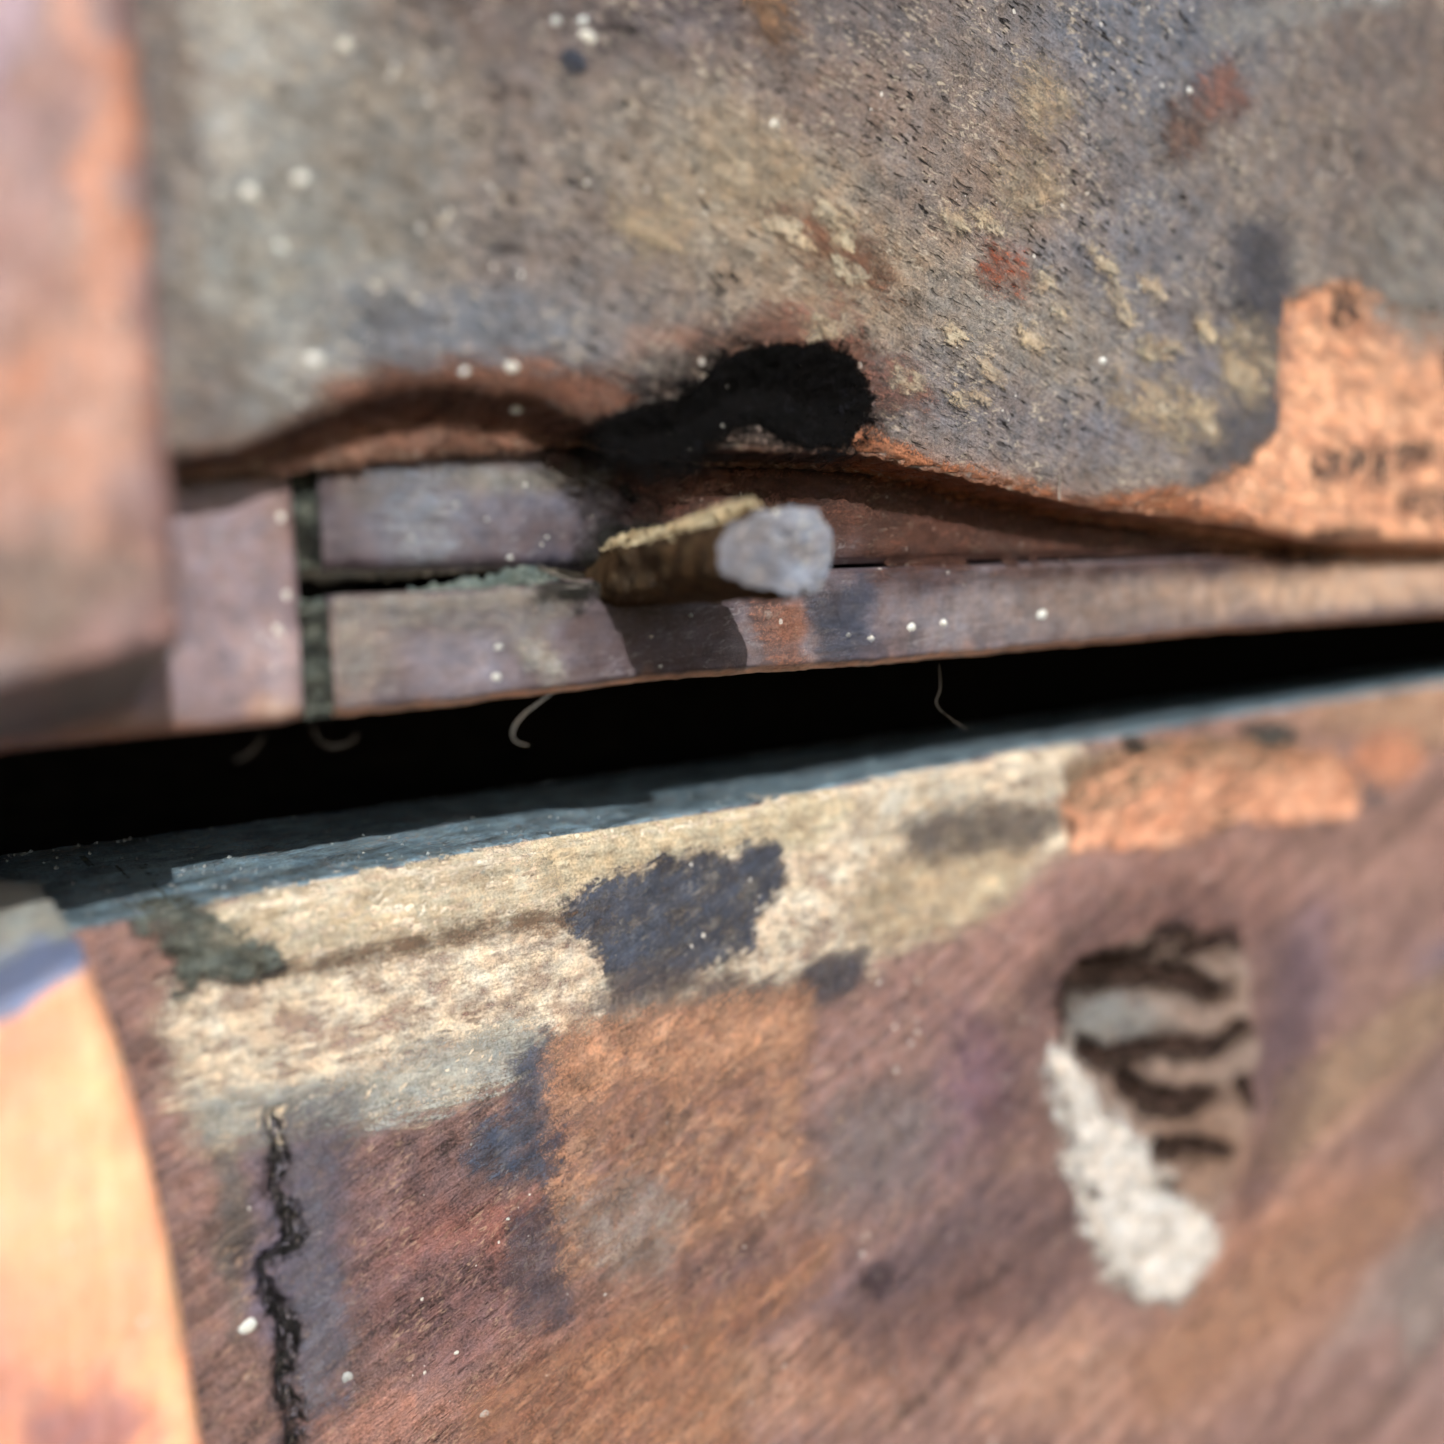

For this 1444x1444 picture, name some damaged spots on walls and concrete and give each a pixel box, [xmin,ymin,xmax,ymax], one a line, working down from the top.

spalling [823,274,1444,566]
damp [558,838,871,1032]
peeling [144,719,1390,1314]
crack [253,1113,310,1444]